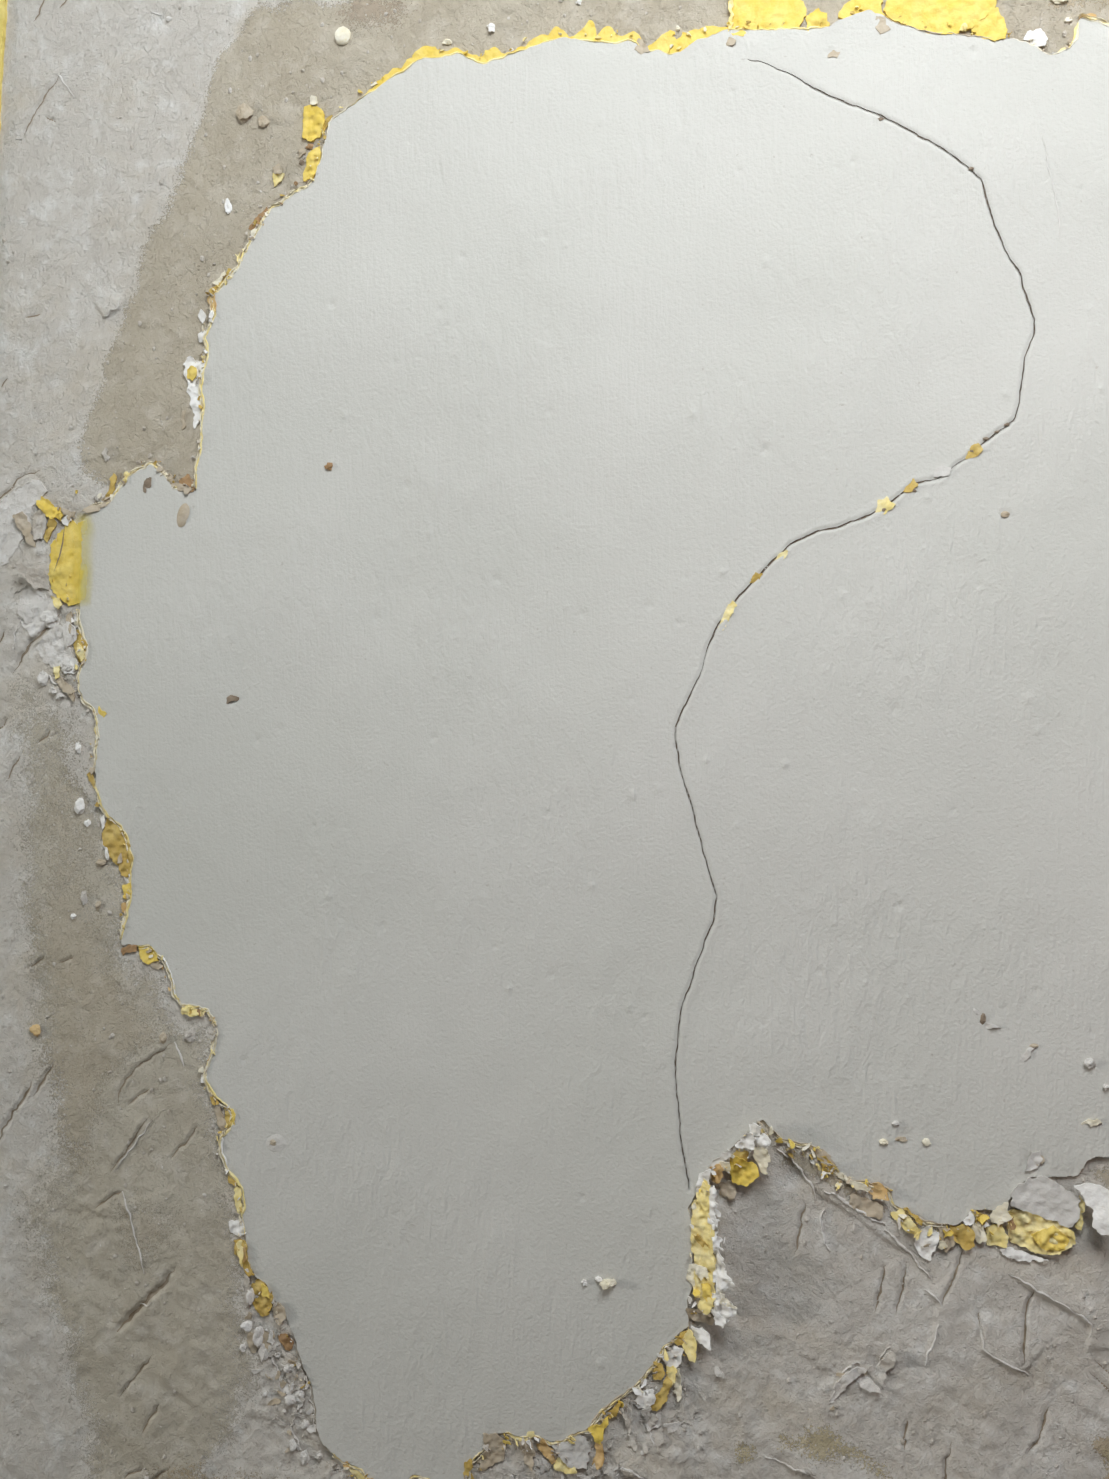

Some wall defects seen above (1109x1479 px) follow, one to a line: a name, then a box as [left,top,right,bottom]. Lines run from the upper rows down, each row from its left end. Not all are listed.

peeling [838,0,1109,55]
peeling [0,0,830,1479]
crack [674,59,1035,1183]
peeling [973,1008,1000,1029]
peeling [463,1120,1109,1479]